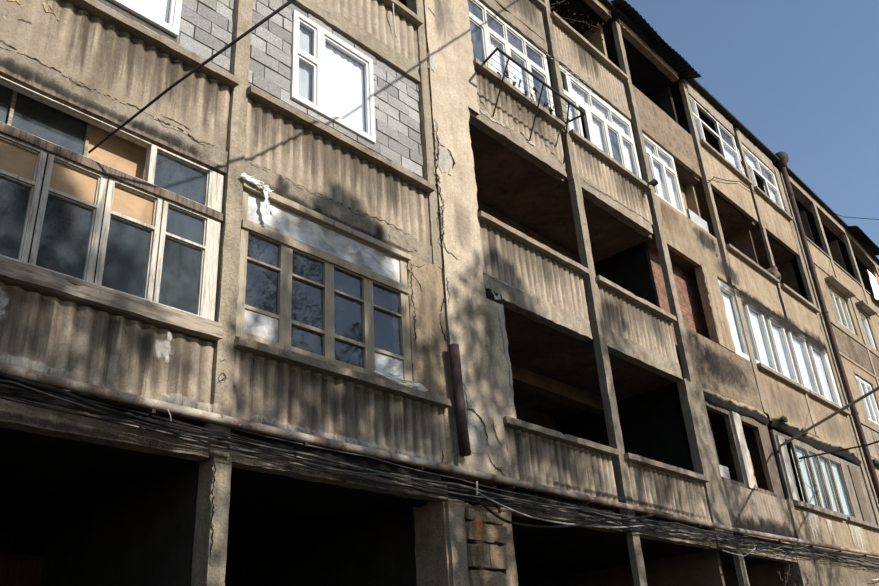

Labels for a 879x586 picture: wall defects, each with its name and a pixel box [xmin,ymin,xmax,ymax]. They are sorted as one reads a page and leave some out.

damp [0,58,58,88]
crack [0,40,219,148]
damp [134,121,198,153]
crack [432,119,458,259]
spalling [438,147,454,176]
crack [405,262,422,350]
crack [438,278,451,344]
peeling [155,332,172,358]
damp [700,348,748,389]
crack [488,419,505,477]
crack [209,459,218,564]